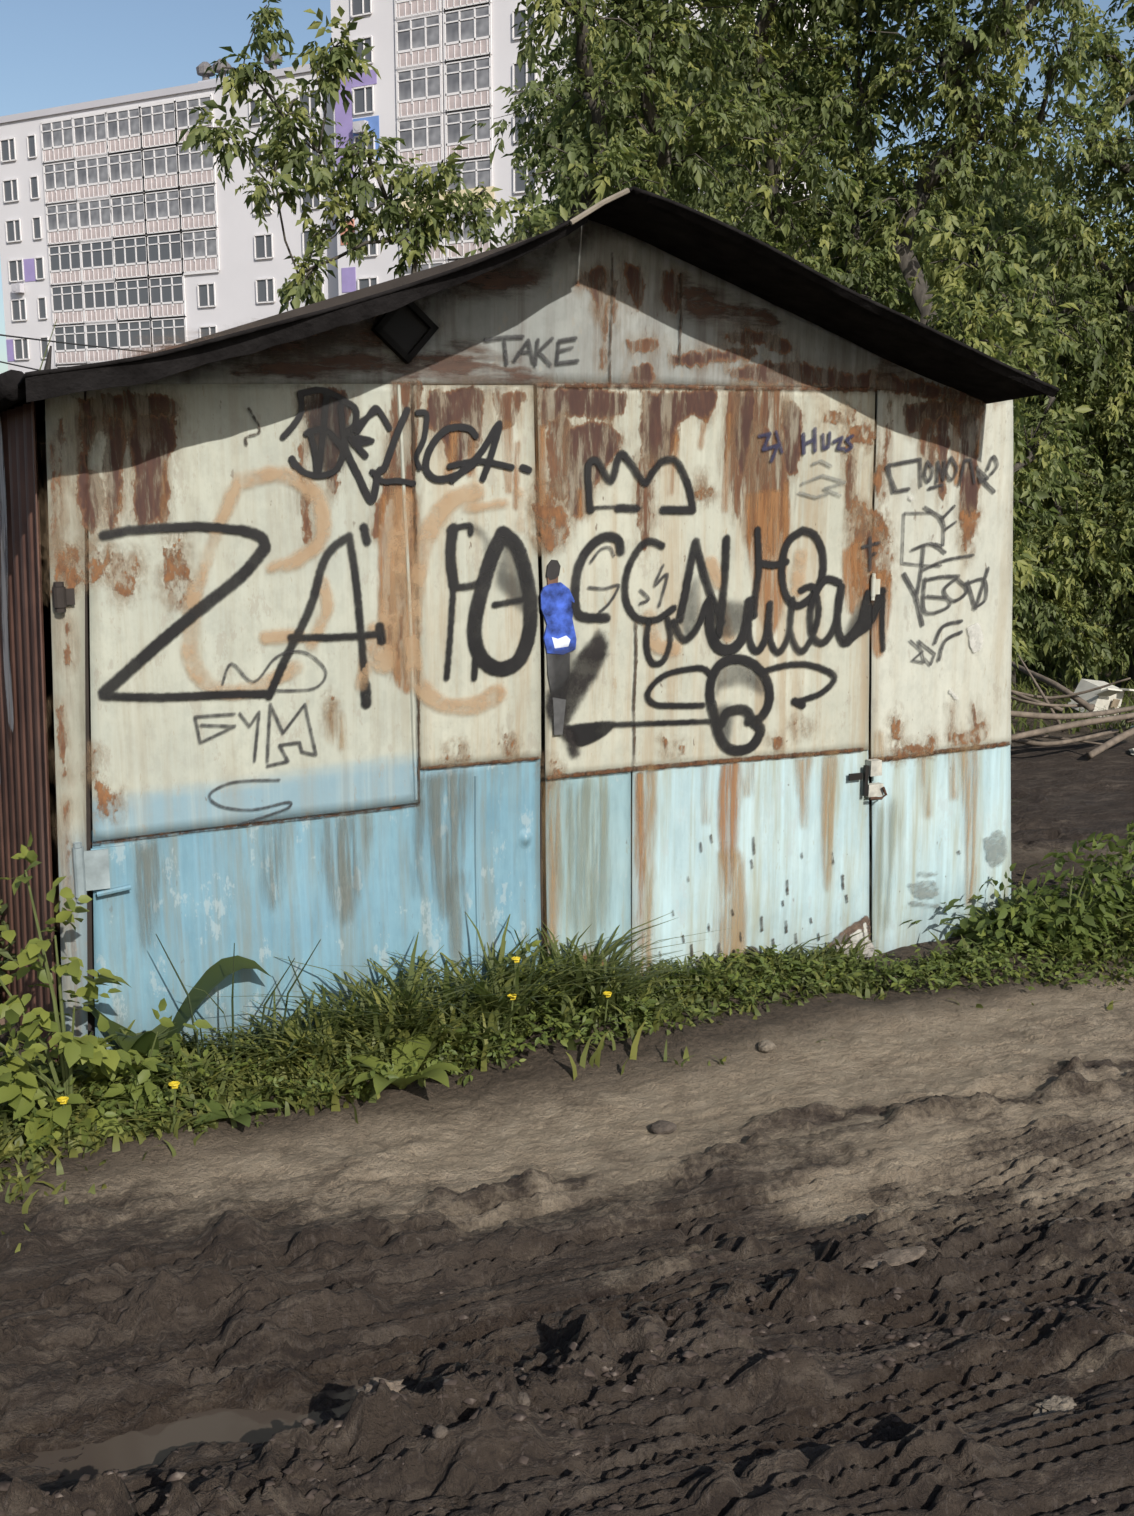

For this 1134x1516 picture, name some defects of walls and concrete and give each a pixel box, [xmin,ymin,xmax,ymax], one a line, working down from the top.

corrosion [131,344,186,357]
corrosion [49,389,180,598]
corrosion [232,260,985,692]
corrosion [163,538,193,611]
corrosion [64,622,72,666]
corrosion [56,705,67,778]
corrosion [63,800,71,879]
corrosion [423,703,1010,963]